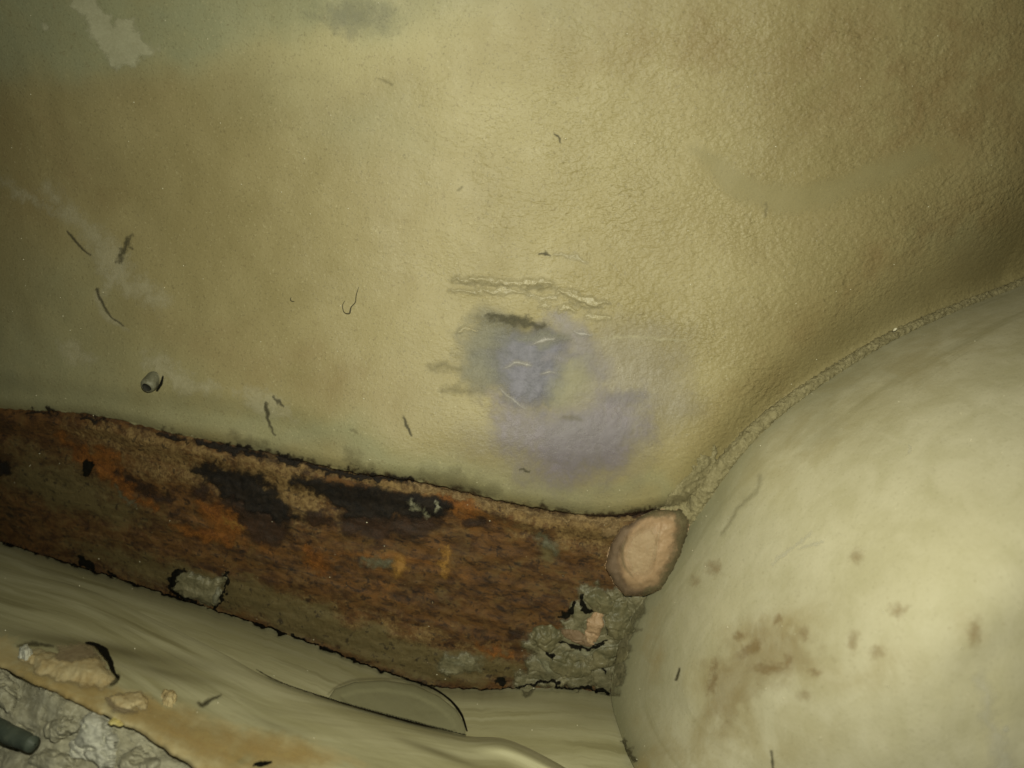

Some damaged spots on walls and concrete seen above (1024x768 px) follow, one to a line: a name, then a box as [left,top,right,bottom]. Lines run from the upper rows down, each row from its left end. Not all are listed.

peeling [450,276,611,321]
corrosion [0,406,664,691]
peeling [18,641,148,727]